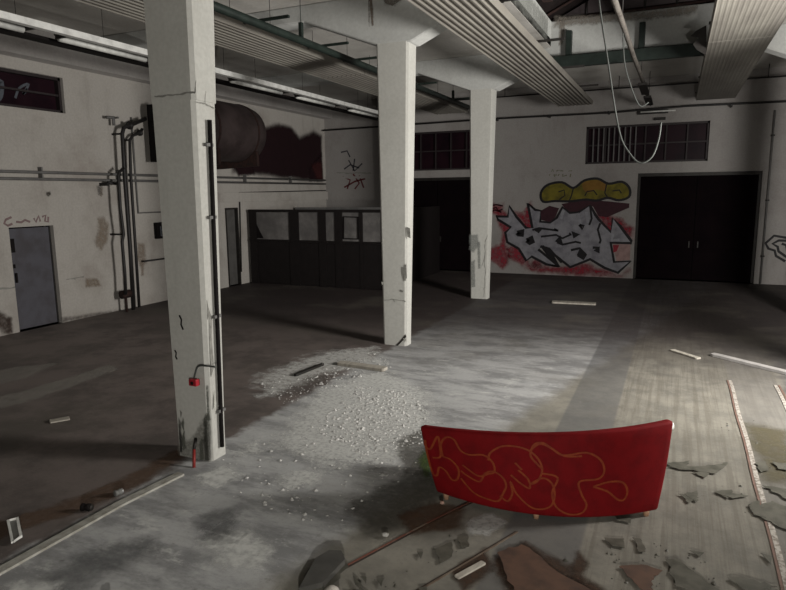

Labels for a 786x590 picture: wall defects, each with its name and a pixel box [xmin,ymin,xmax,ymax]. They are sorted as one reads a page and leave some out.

crack [154,82,215,109]
water stain [452,550,514,590]
water stain [521,542,603,590]